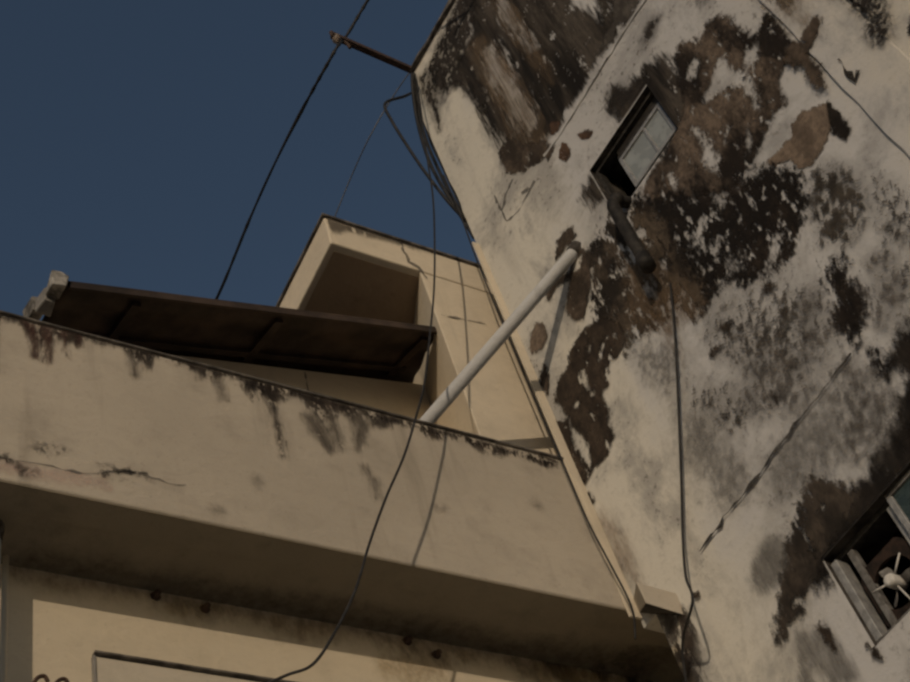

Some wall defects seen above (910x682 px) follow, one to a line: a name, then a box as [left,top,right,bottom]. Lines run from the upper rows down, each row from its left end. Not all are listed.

mould [644,17,659,42]
damp [419,0,618,148]
damp [605,53,692,158]
peeling [637,10,828,206]
peeling [766,102,851,169]
damp [837,59,860,82]
damp [581,175,604,207]
crack [400,241,427,278]
damp [0,314,159,376]
damp [585,160,910,502]
damp [177,360,557,467]
crack [0,456,186,486]